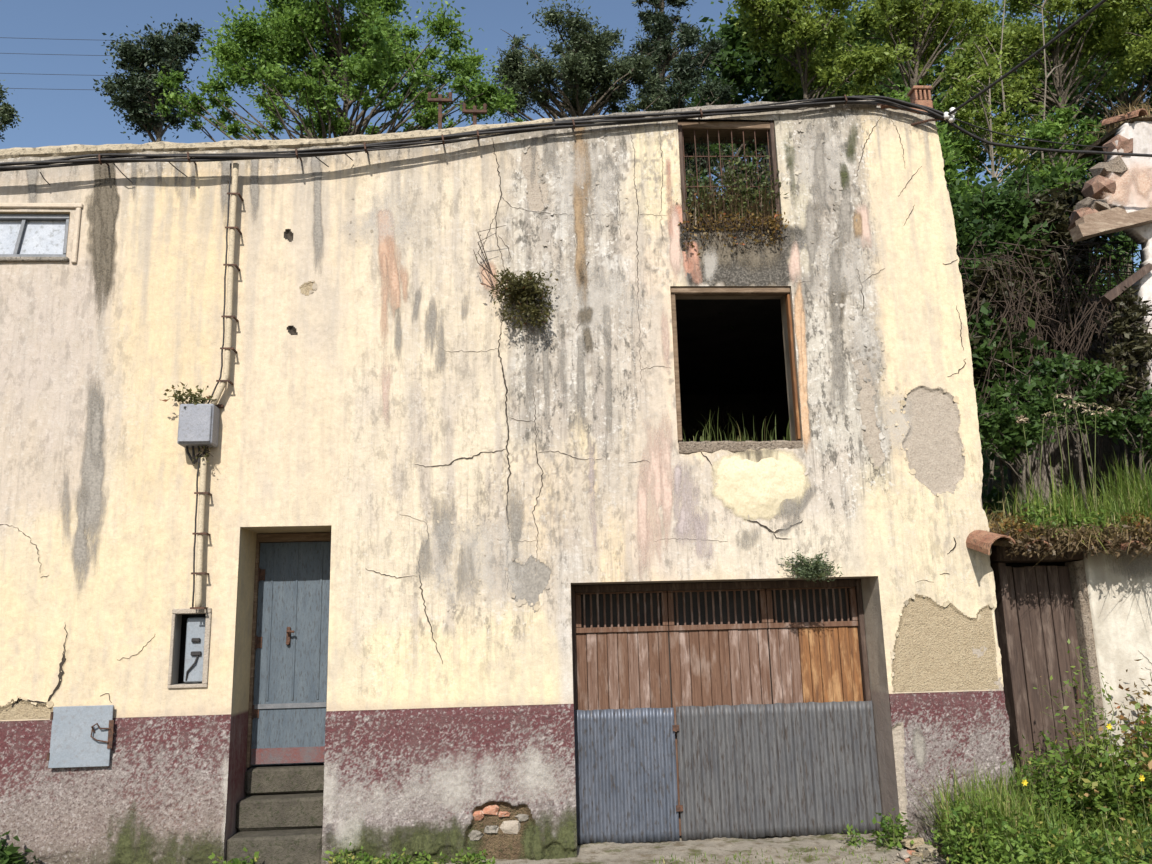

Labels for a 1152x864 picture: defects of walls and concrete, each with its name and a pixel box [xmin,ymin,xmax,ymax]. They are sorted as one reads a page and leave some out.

leakage [87,156,137,297]
corrosion [378,210,408,331]
flaking render [795,117,966,496]
flaking render [1105,170,1152,205]
leakage [62,387,104,582]
crack [415,315,656,590]
crack [0,524,49,578]
crack [0,622,69,712]
crack [365,514,444,664]
flaking render [504,525,551,612]
flaking render [890,594,999,692]
spalling [465,801,535,863]